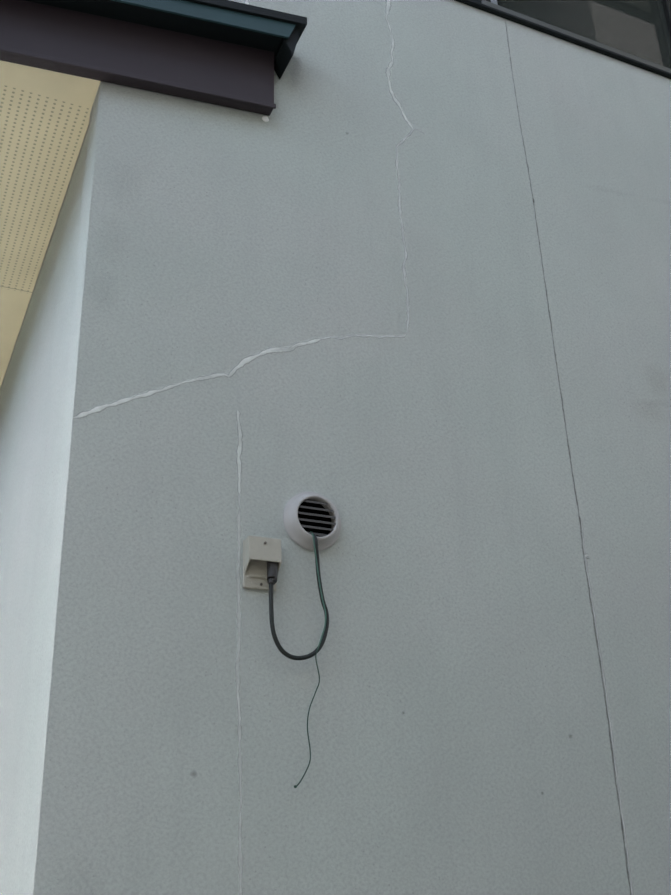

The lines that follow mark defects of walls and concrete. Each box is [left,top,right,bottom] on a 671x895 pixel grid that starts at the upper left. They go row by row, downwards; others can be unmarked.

crack [73,0,423,418]
crack [235,411,243,895]